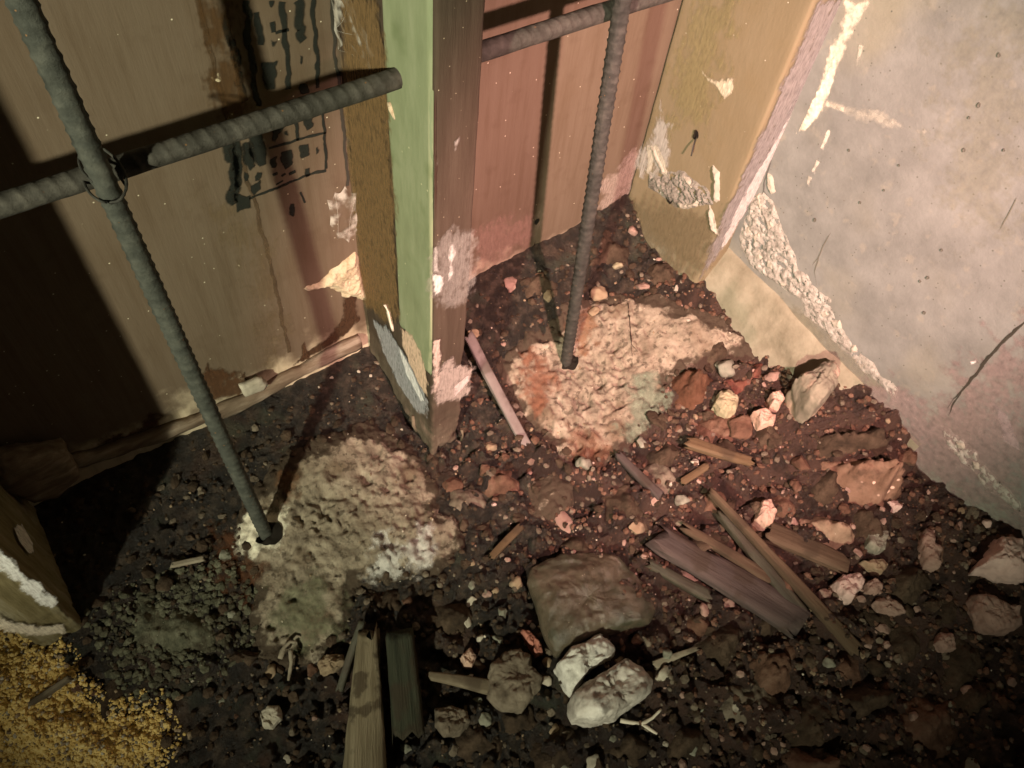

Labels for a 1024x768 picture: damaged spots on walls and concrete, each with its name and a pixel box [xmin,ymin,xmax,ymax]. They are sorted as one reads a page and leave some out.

spalling [0,0,403,541]
spalling [648,145,720,236]
spalling [740,173,898,399]
crack [948,323,1024,416]